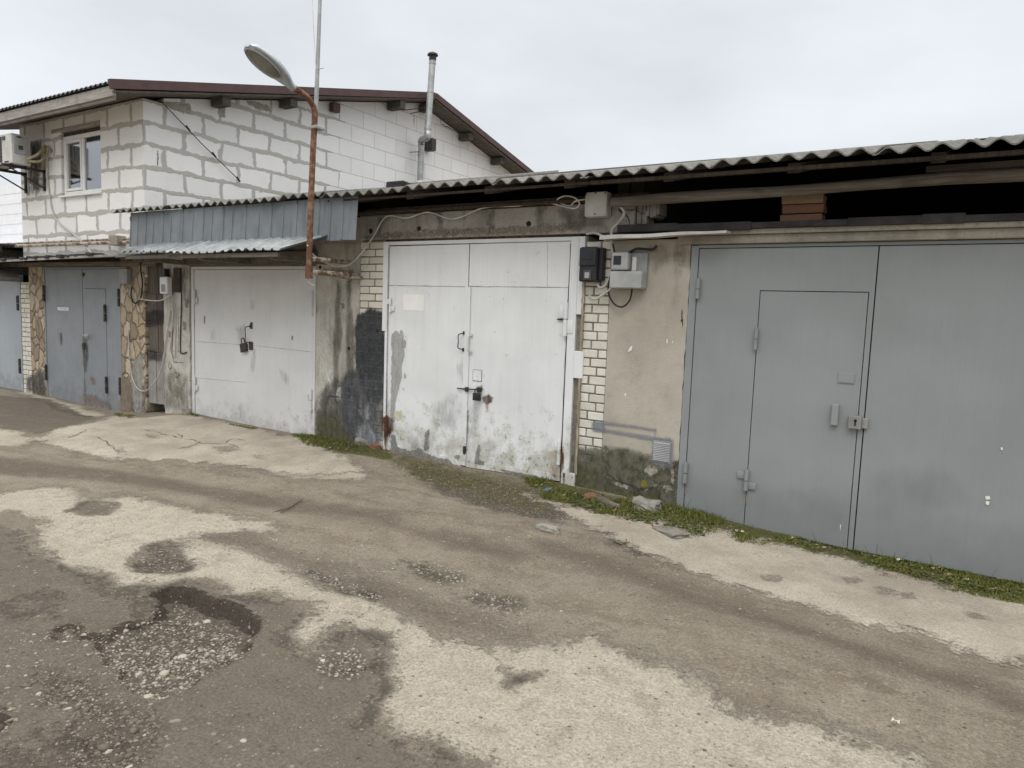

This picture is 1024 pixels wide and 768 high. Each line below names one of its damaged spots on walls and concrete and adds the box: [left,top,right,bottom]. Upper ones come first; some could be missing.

water stain [318,269,356,397]
rust [381,417,393,444]
peeling [390,330,540,478]